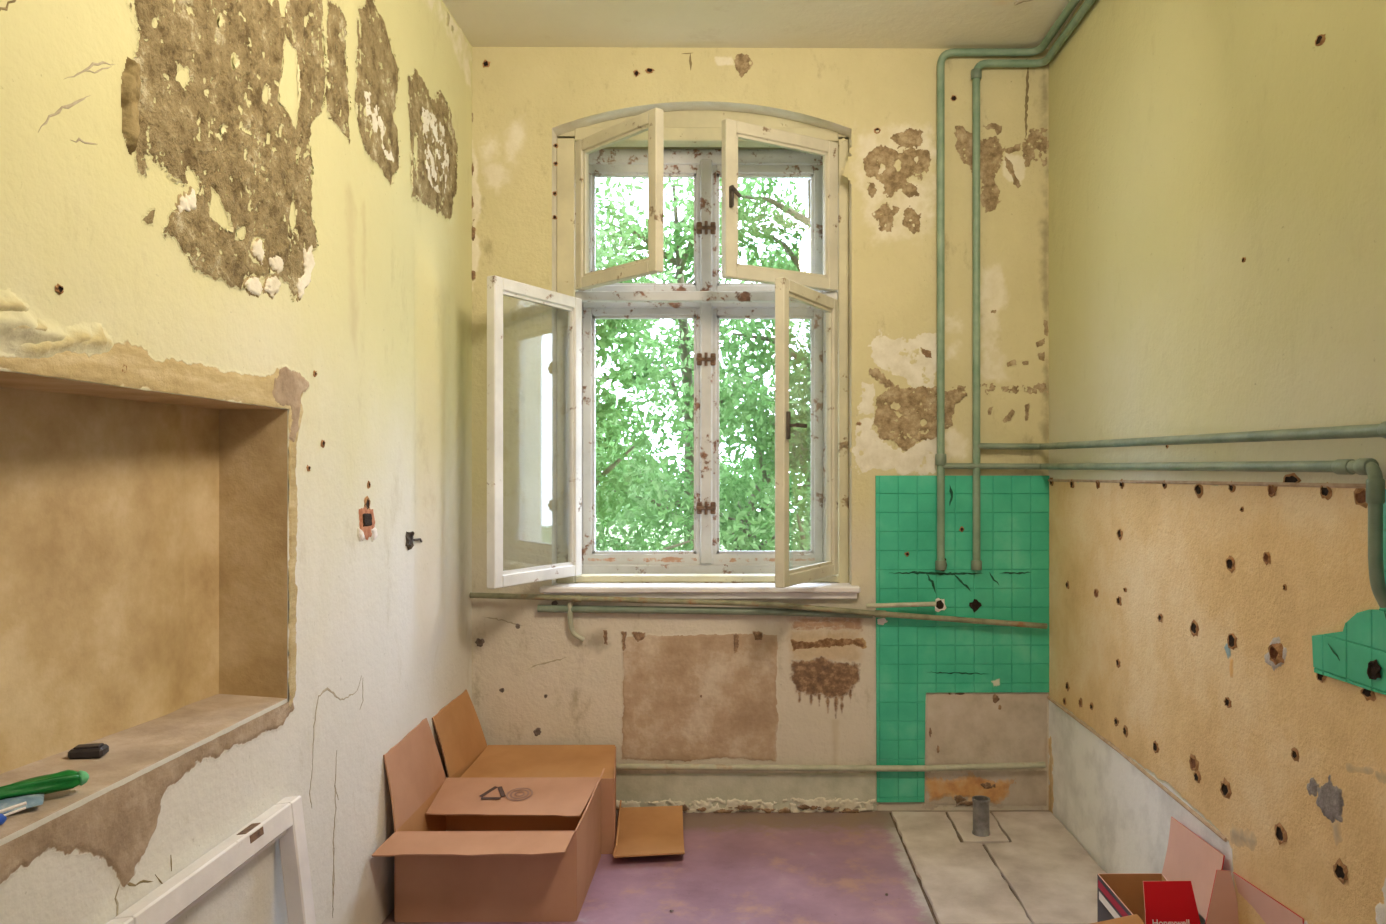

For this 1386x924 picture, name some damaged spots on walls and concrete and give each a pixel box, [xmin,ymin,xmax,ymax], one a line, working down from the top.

crack [0,0,16,11]
crack [38,61,115,145]
spalling [121,0,531,305]
peeling [841,111,949,254]
spalling [954,122,1049,214]
peeling [850,258,1049,477]
peeling [620,630,647,653]
peeling [733,630,764,653]
crack [309,679,364,916]